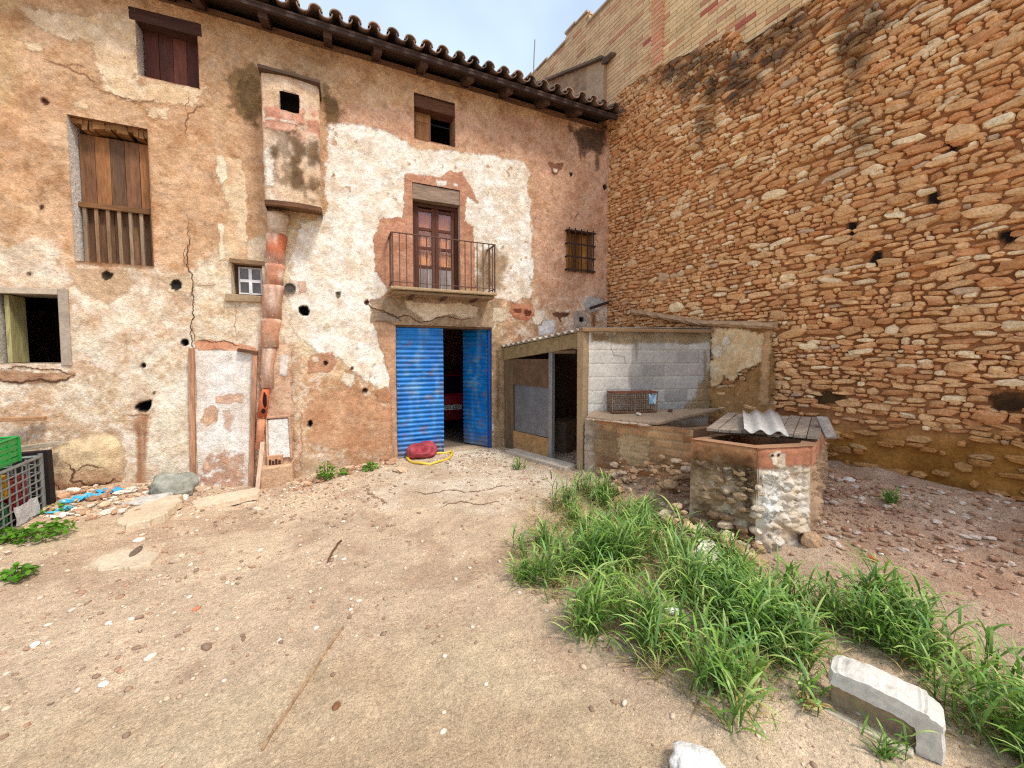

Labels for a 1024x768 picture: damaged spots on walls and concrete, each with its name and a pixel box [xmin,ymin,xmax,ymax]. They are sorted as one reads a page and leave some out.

damp [225,64,262,127]
damp [324,84,340,122]
damp [287,134,320,189]
damp [569,125,606,169]
crack [183,215,217,347]
peeling [288,122,584,473]
flaking render [709,328,772,387]